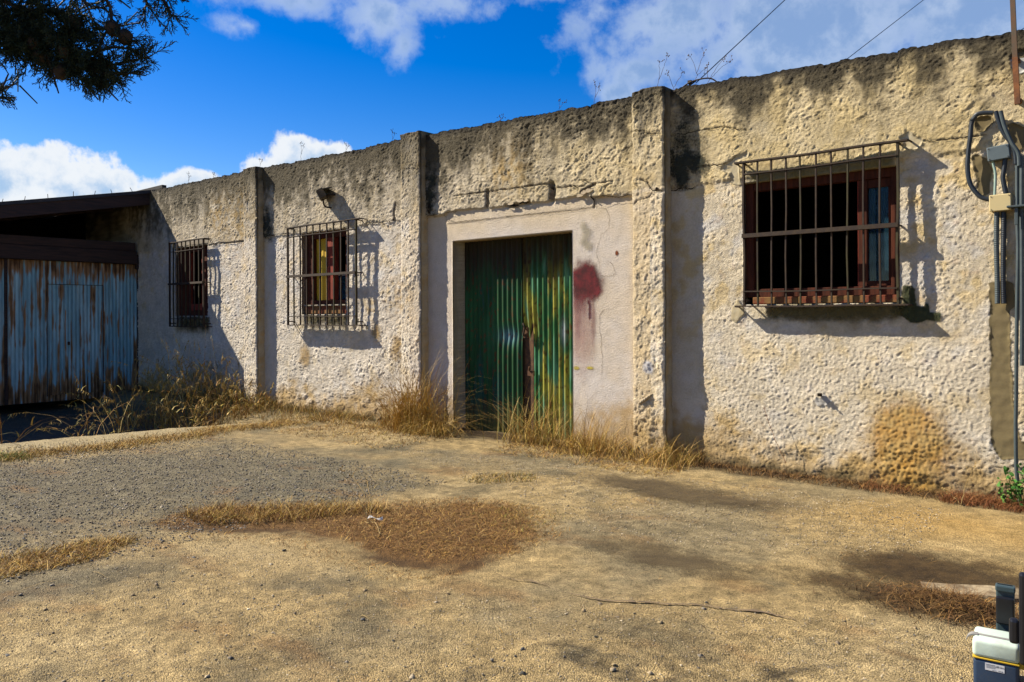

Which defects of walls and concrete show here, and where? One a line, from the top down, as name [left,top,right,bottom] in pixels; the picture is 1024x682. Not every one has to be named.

damp [670,109,710,190]